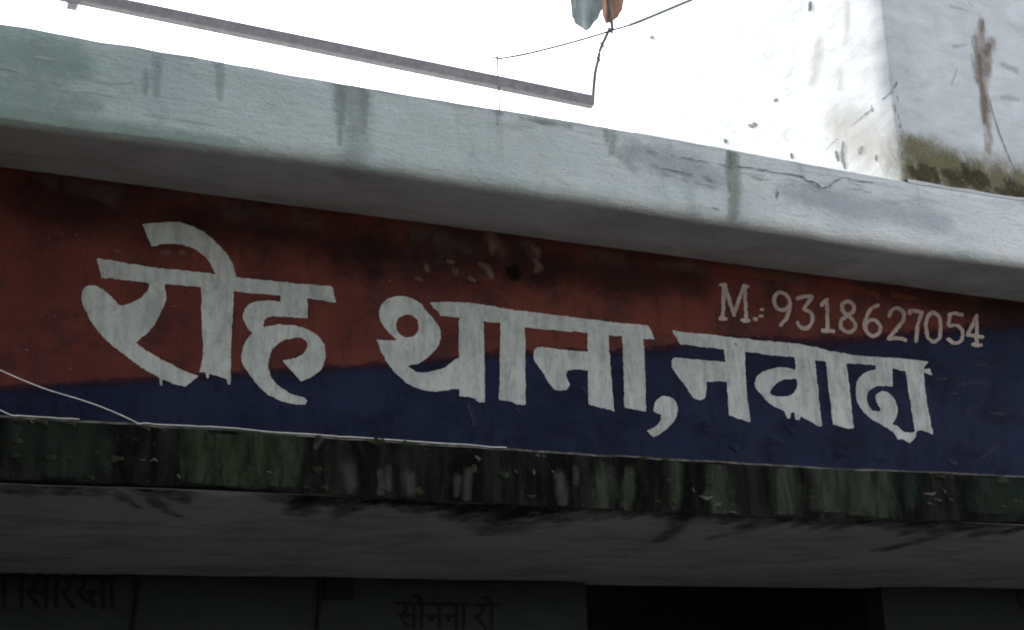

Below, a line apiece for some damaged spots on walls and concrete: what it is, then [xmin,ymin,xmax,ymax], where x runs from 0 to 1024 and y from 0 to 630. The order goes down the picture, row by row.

corrosion [975,19,994,153]
crack [626,146,874,211]
water stain [378,467,415,495]
water stain [454,469,472,501]
water stain [555,467,578,506]